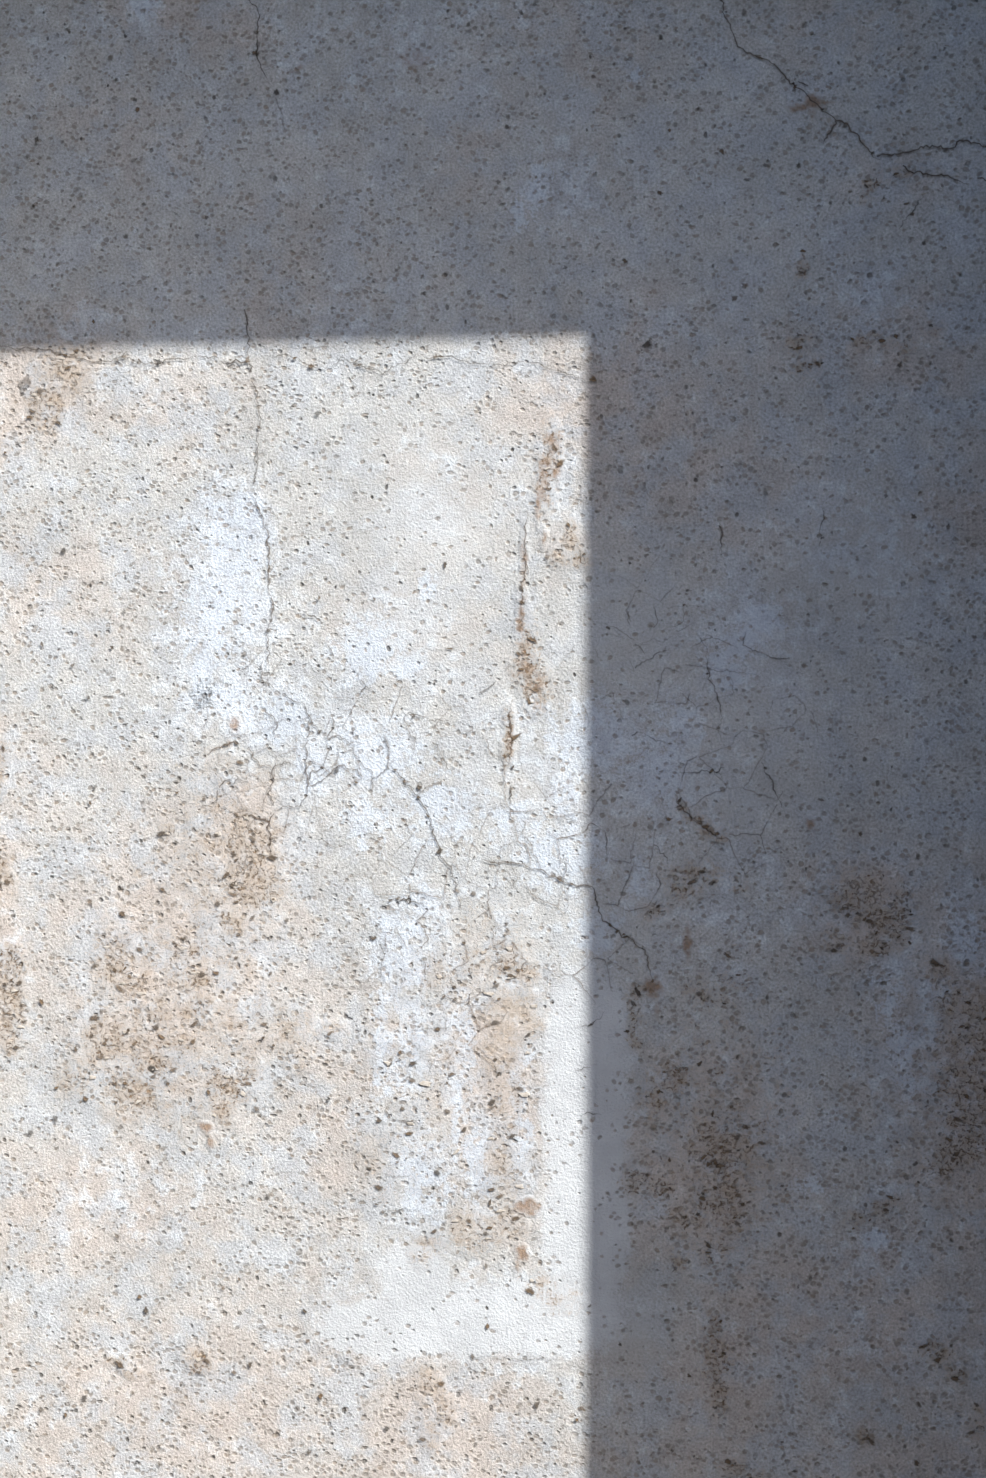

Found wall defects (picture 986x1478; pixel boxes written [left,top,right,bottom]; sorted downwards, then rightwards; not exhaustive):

crack [722,1,986,228]
crack [5,309,667,987]
water stain [163,459,794,962]
corrosion [508,497,550,773]
crack [606,604,686,668]
crack [676,762,782,850]